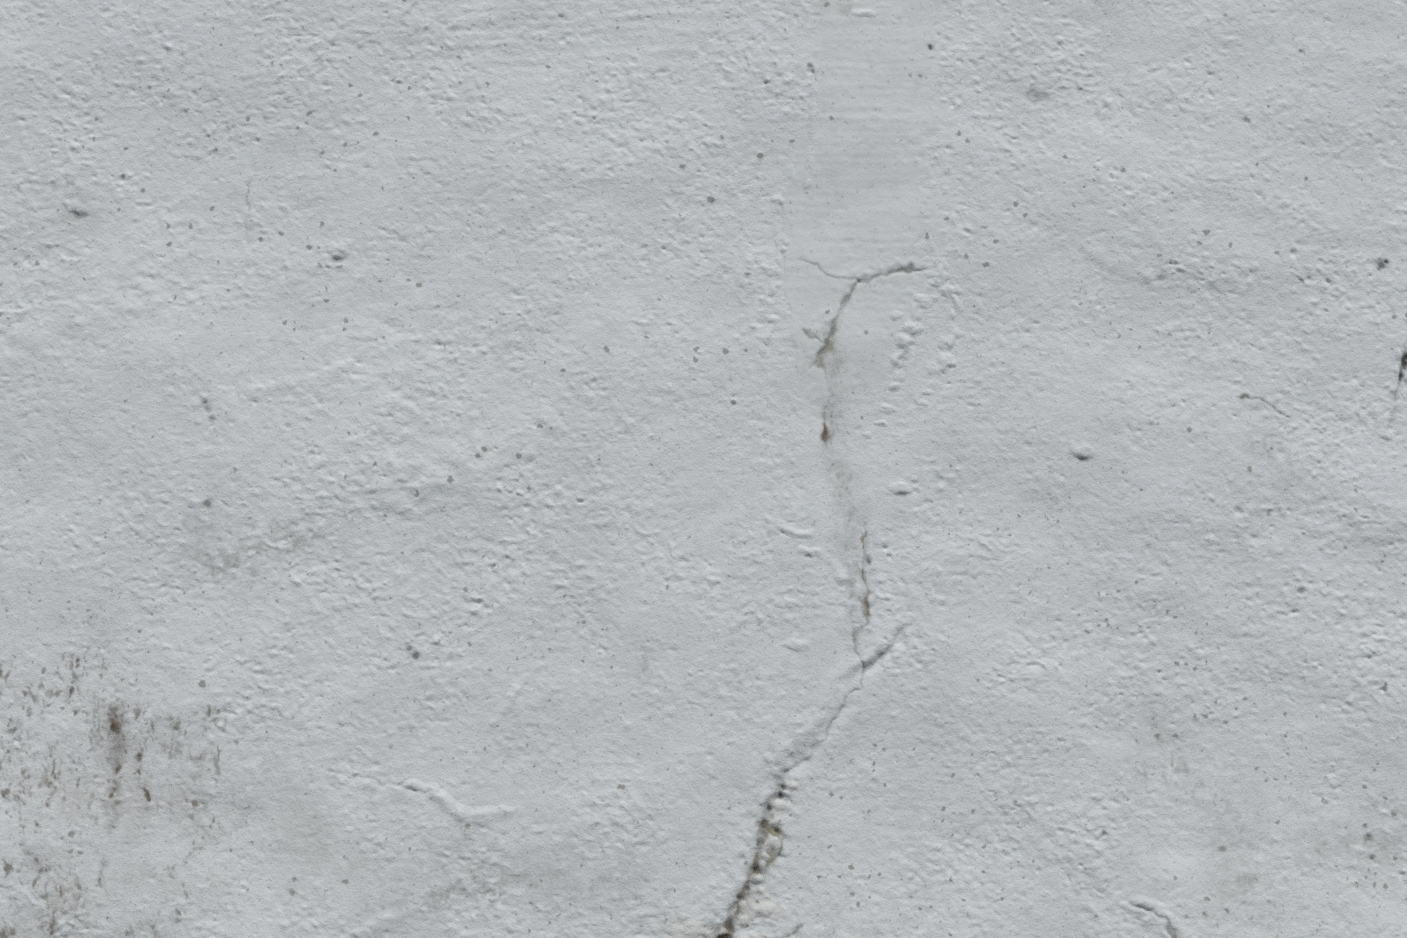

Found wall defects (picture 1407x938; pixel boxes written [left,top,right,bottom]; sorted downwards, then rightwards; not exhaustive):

crack [718,780,800,936]